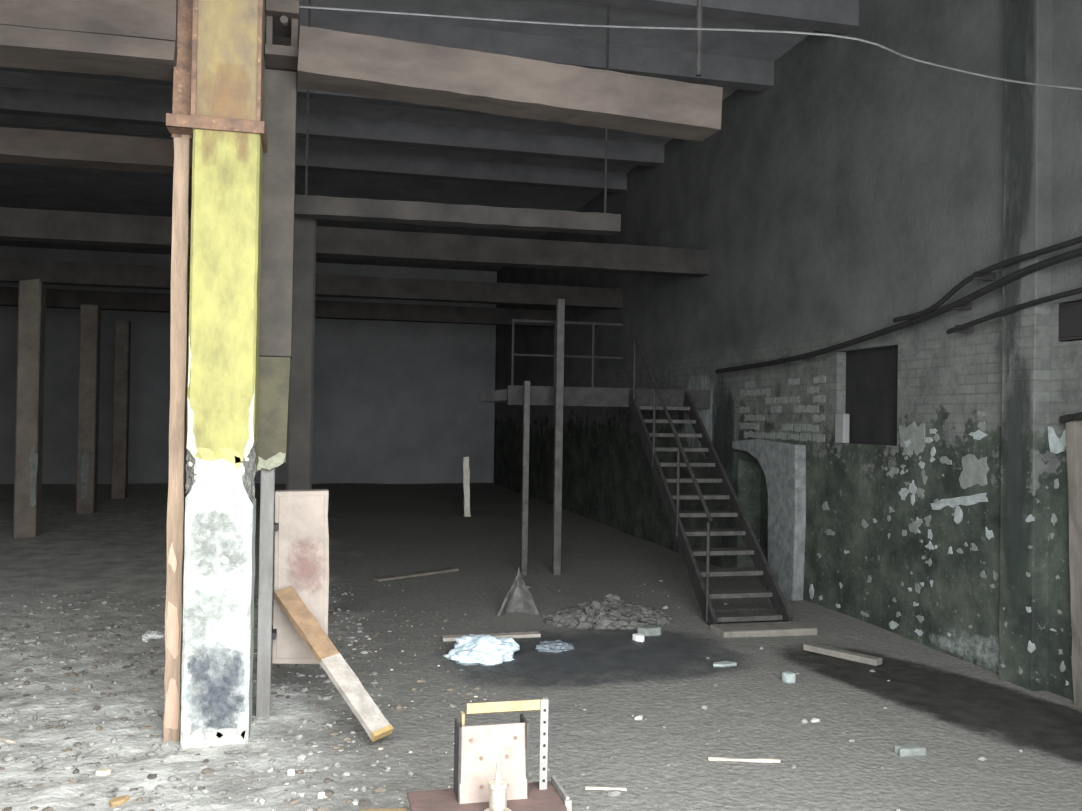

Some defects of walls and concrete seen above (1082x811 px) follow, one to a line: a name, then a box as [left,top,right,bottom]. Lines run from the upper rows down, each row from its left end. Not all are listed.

leakage [1003,0,1034,361]
flaking render [969,410,988,440]
peeling [1048,426,1066,454]
flaking render [861,421,990,566]
leakage [1002,368,1030,583]
peeling [901,571,934,636]
flaking render [208,615,249,650]
leakage [932,630,999,666]
leakage [188,658,207,682]
leakage [203,658,242,725]
spalling [181,714,249,742]